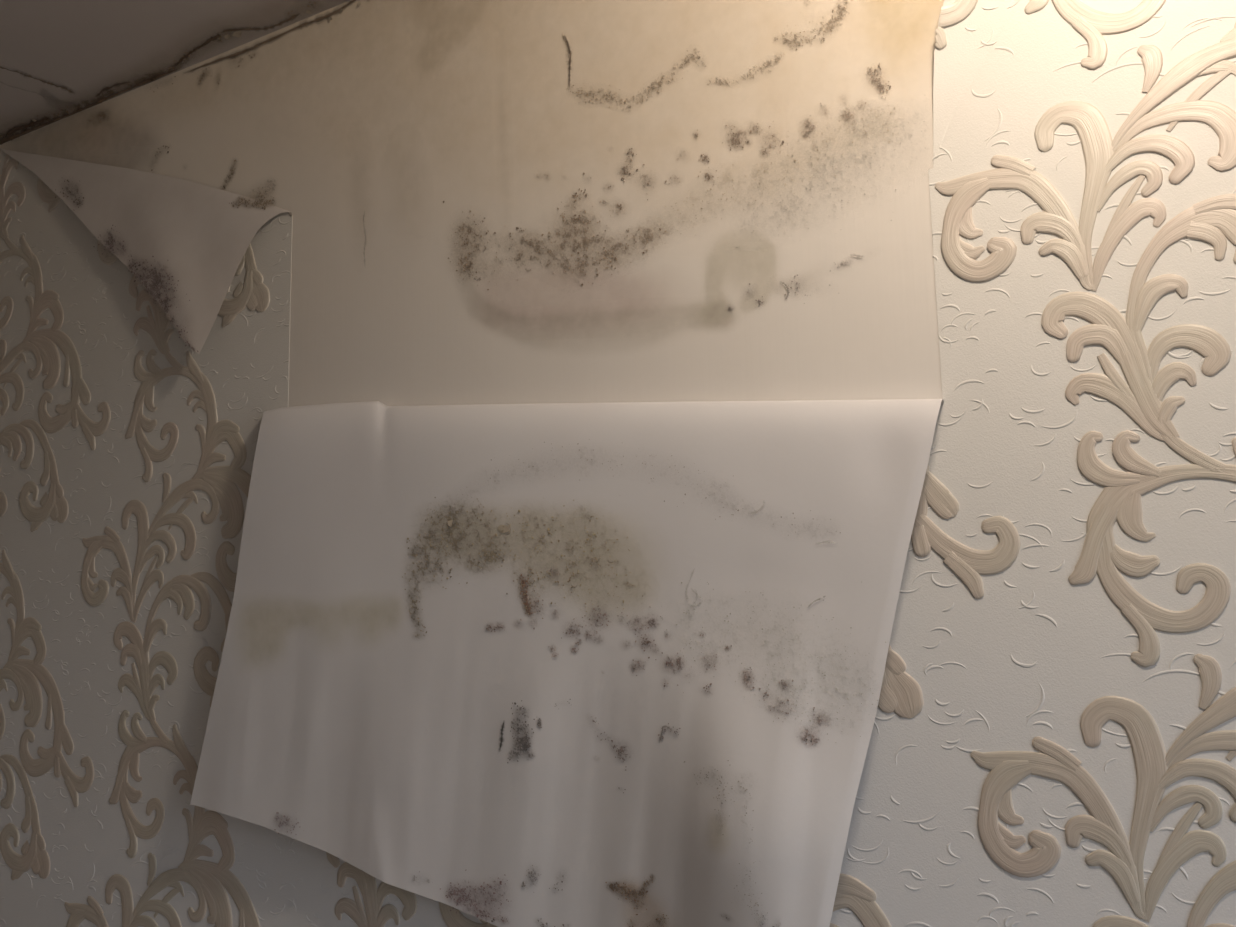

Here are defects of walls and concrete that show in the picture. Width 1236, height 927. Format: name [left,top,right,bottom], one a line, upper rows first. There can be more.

crack [0,0,361,144]
leakage [566,50,705,112]
leakage [747,1,850,77]
leakage [448,63,925,290]
leakage [402,494,732,693]
leakage [735,599,878,745]
leakage [507,700,542,763]
leakage [413,865,539,922]
leakage [605,876,669,927]